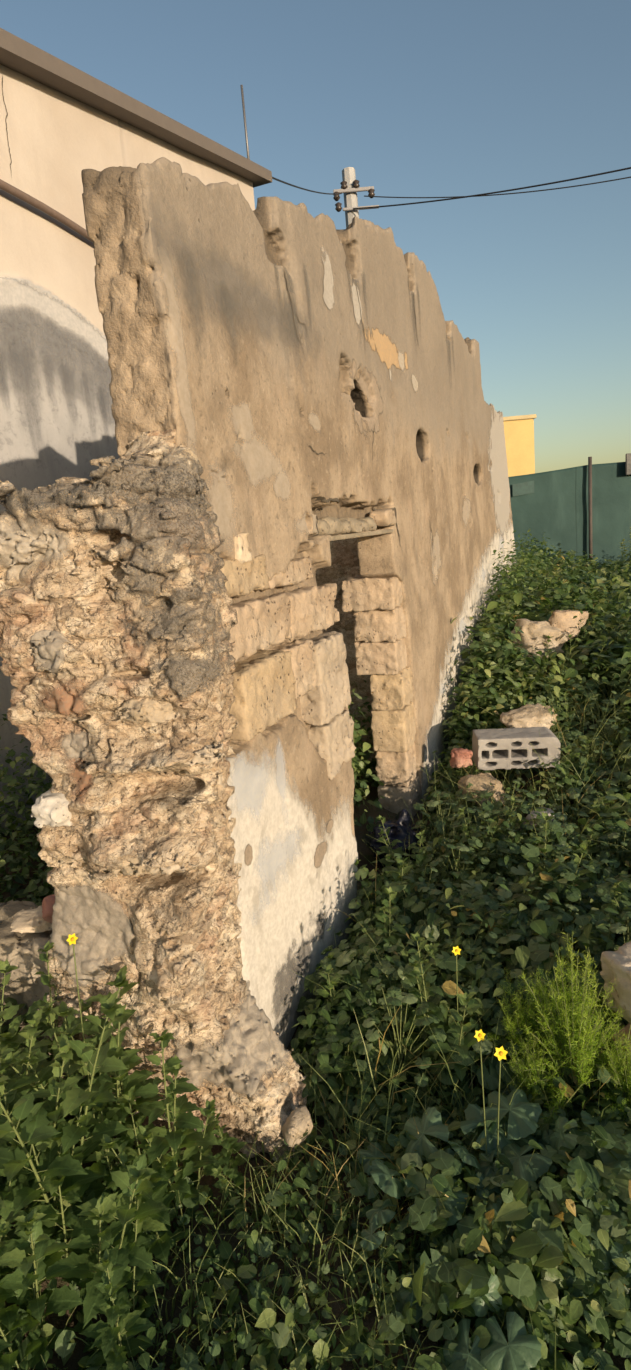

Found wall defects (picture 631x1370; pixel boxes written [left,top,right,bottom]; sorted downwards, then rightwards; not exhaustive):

crack [2,75,12,176]
flaking render [321,247,334,310]
damp [0,309,112,409]
spalling [349,283,418,436]
damp [0,445,209,580]
damp [273,913,327,1031]